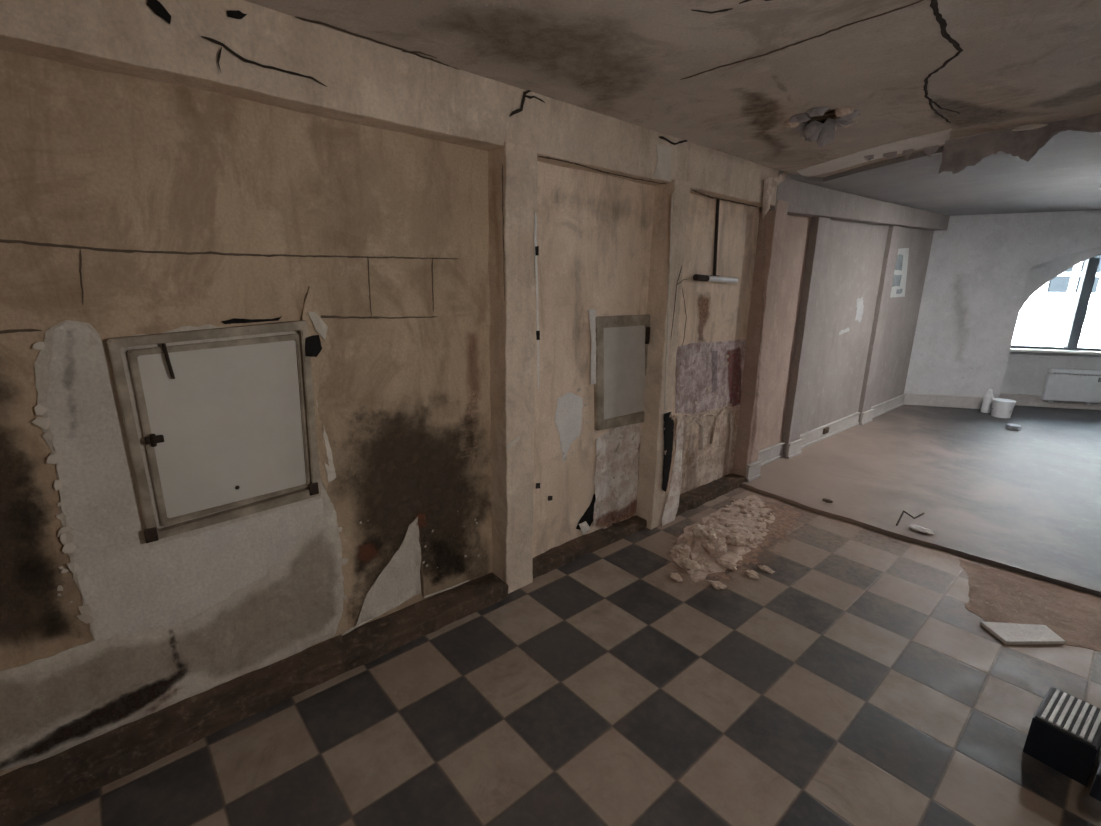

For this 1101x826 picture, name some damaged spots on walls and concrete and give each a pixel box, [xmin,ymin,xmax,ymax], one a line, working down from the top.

flaking render [147,0,171,24]
flaking render [226,10,247,19]
crack [201,36,327,87]
crack [680,0,963,123]
crack [510,90,545,116]
leakage [341,412,489,589]
leakage [0,429,73,640]